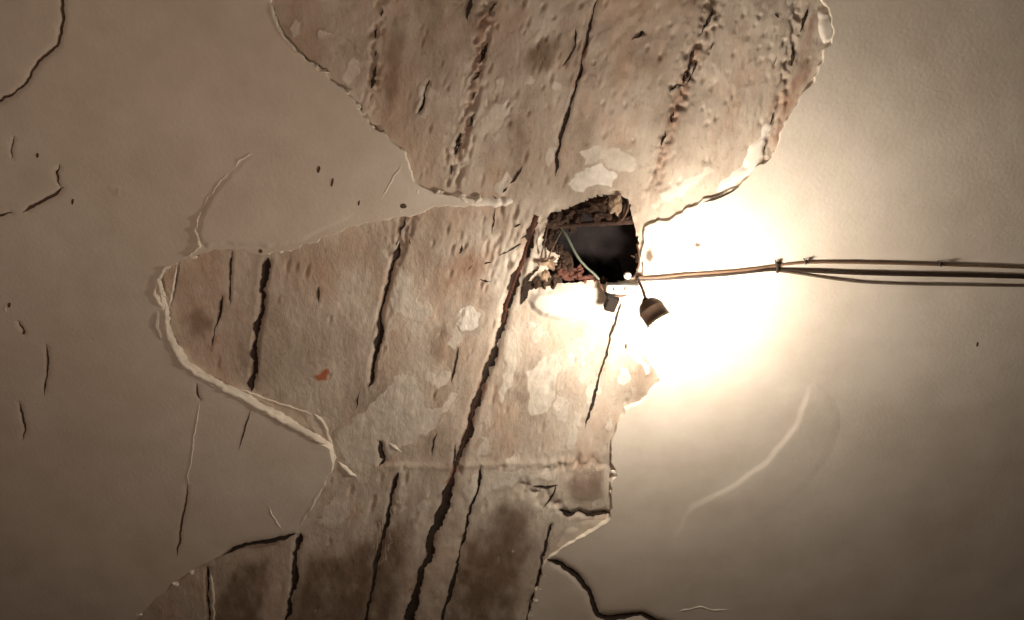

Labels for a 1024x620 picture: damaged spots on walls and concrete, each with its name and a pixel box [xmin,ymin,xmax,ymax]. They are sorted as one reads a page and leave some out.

crack [0,0,65,102]
crack [555,0,598,177]
crack [660,9,714,146]
crack [238,257,271,450]
crack [356,217,411,409]
crack [404,166,538,620]
spalling [135,0,835,620]
rust [434,211,634,313]
crack [585,302,622,427]
crack [207,533,303,620]
crack [364,441,399,620]
crack [527,485,659,620]